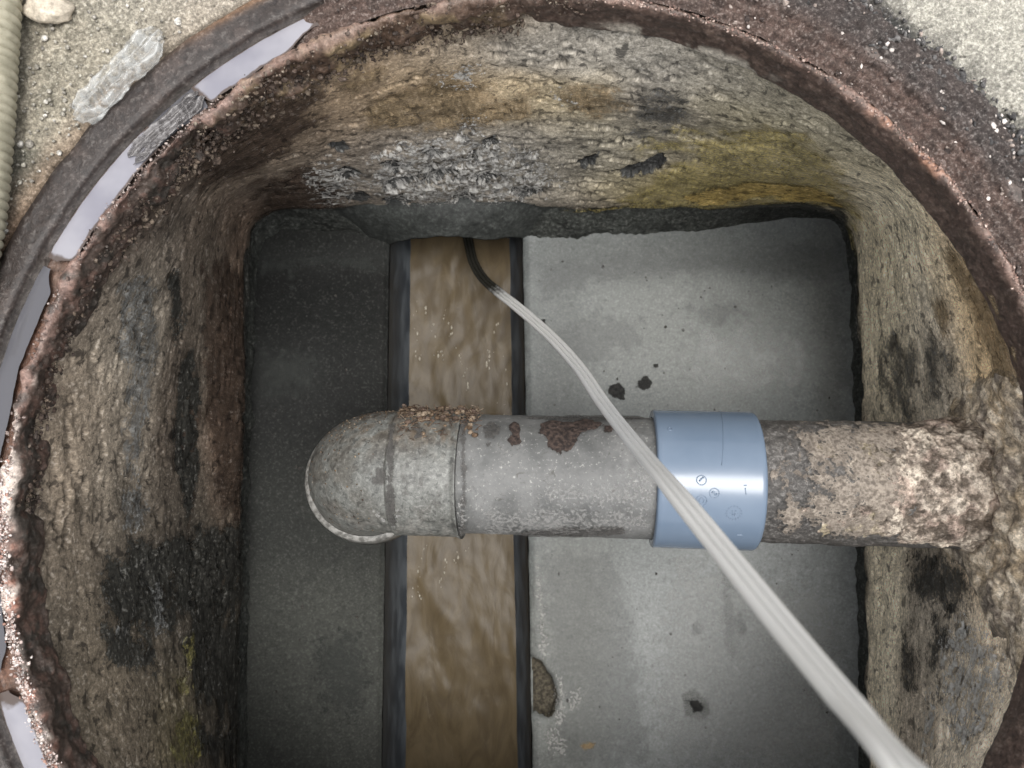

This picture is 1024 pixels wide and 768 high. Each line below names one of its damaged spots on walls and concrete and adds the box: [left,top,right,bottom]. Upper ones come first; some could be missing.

leakage [430,63,485,91]
leakage [302,115,570,210]
leakage [577,88,860,250]
leakage [877,298,955,423]
leakage [943,247,1016,386]
leakage [98,268,245,768]
leakage [900,548,1009,760]